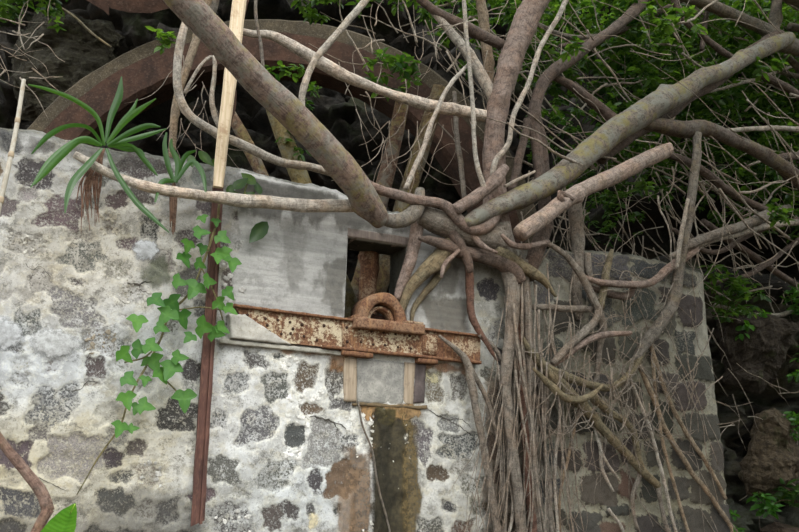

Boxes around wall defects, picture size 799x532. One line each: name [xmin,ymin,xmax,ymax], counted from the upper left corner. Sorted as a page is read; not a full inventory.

rust [328,354,348,371]
rust [338,444,377,532]
leakage [370,412,422,532]